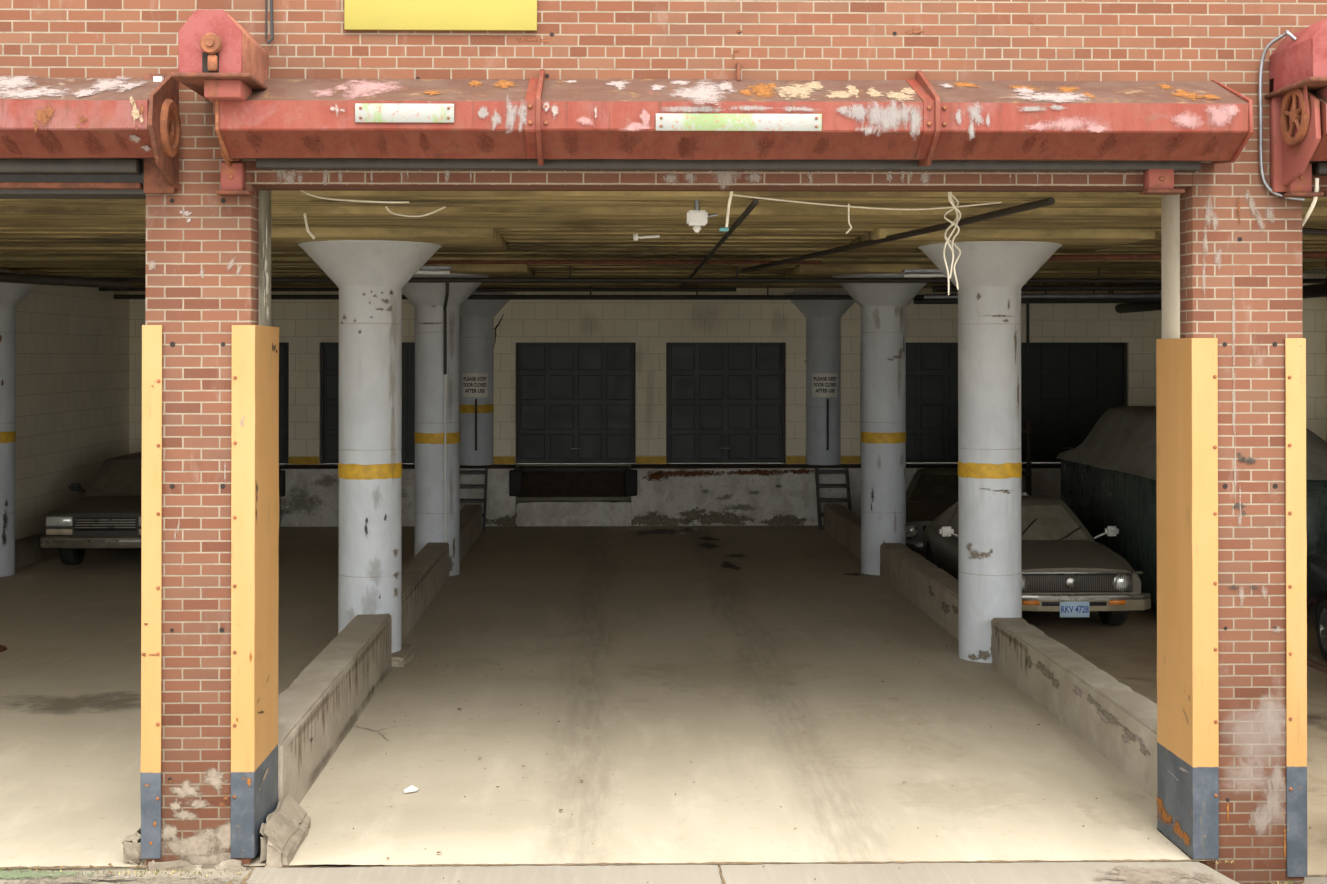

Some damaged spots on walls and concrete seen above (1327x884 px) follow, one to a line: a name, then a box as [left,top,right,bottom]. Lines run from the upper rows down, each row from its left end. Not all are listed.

peeling [469,80,527,130]
peeling [652,80,921,133]
peeling [1012,86,1105,132]
rust [643,469,814,481]
spalling [1026,655,1151,756]
spalling [169,769,228,812]
rust [1157,797,1190,846]